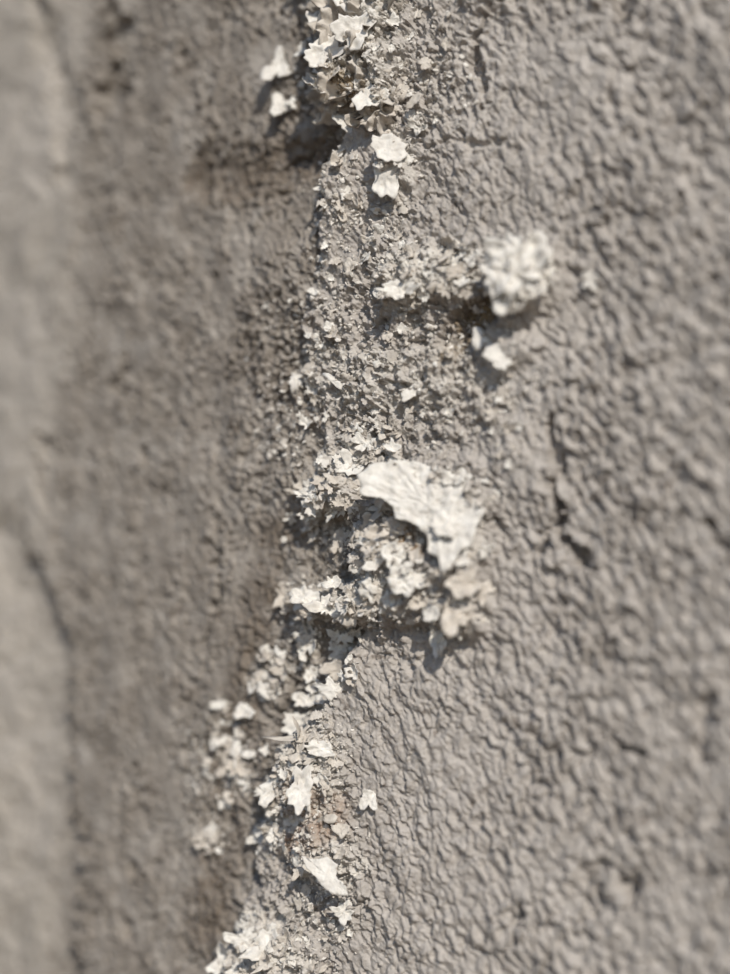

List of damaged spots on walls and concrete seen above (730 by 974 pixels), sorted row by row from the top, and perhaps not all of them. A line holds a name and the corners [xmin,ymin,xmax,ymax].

flaking render [169,0,566,974]